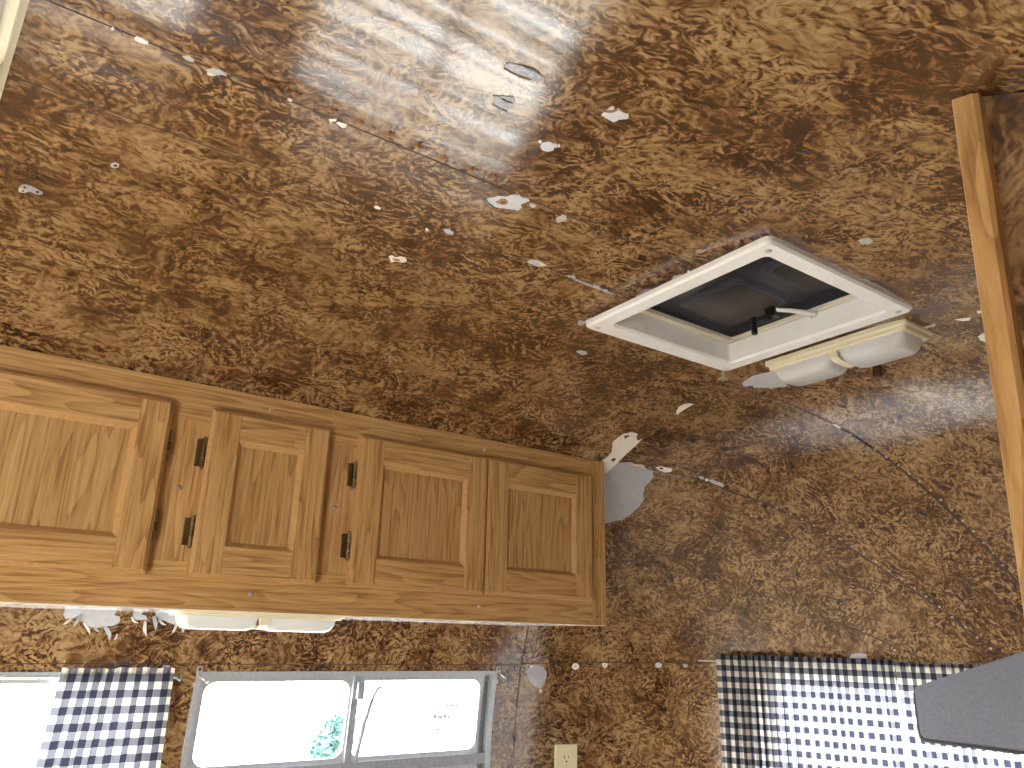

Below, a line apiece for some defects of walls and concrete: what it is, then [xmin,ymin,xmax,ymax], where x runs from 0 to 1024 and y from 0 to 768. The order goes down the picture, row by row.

peeling [207,68,241,80]
peeling [598,106,629,122]
peeling [538,140,560,152]
peeling [18,184,43,195]
peeling [483,194,537,211]
peeling [742,372,787,389]
peeling [603,432,672,523]
peeling [63,610,185,640]
peeling [526,665,547,693]